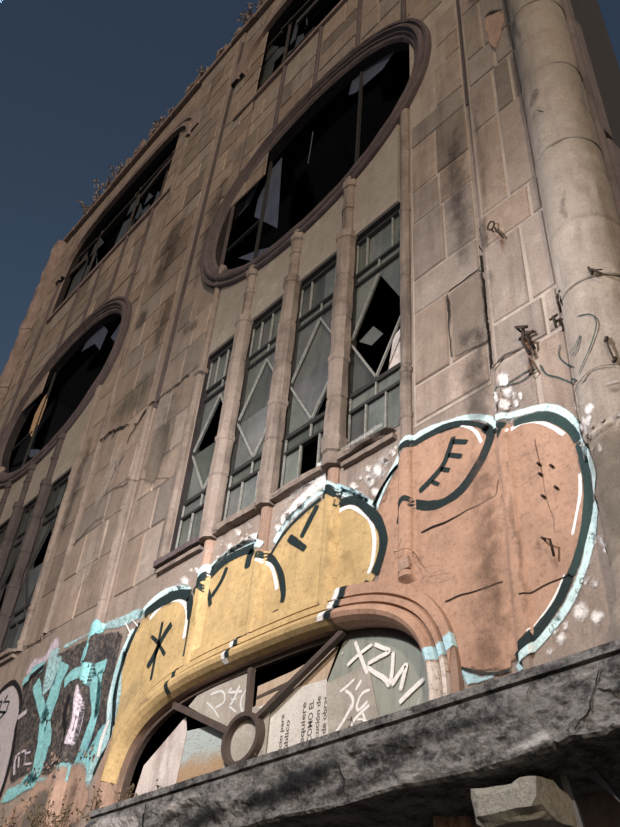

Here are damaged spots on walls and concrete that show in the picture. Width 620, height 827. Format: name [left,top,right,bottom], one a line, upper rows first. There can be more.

spalling [485,9,505,47]
crack [99,374,190,495]
crack [574,669,612,730]